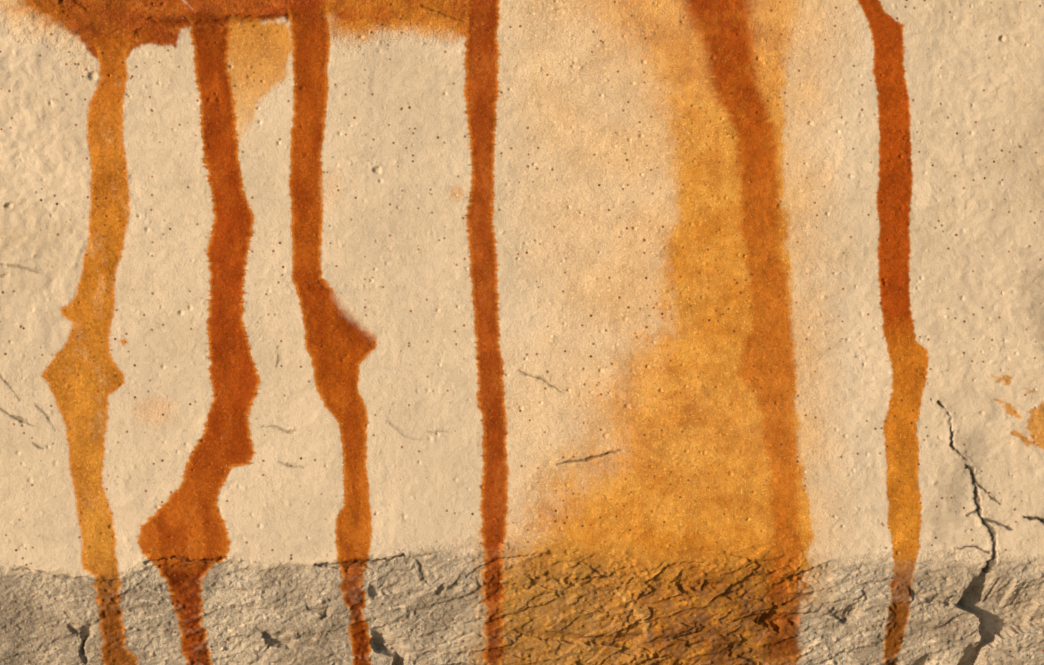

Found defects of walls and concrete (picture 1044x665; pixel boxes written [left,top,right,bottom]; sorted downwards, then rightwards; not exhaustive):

rust [0,0,468,665]
rust [451,0,931,665]
rust [991,374,1044,455]
crack [936,399,1044,575]
spalling [0,553,102,665]
spalling [120,536,477,665]
spalling [801,545,894,665]
spalling [895,543,1044,665]